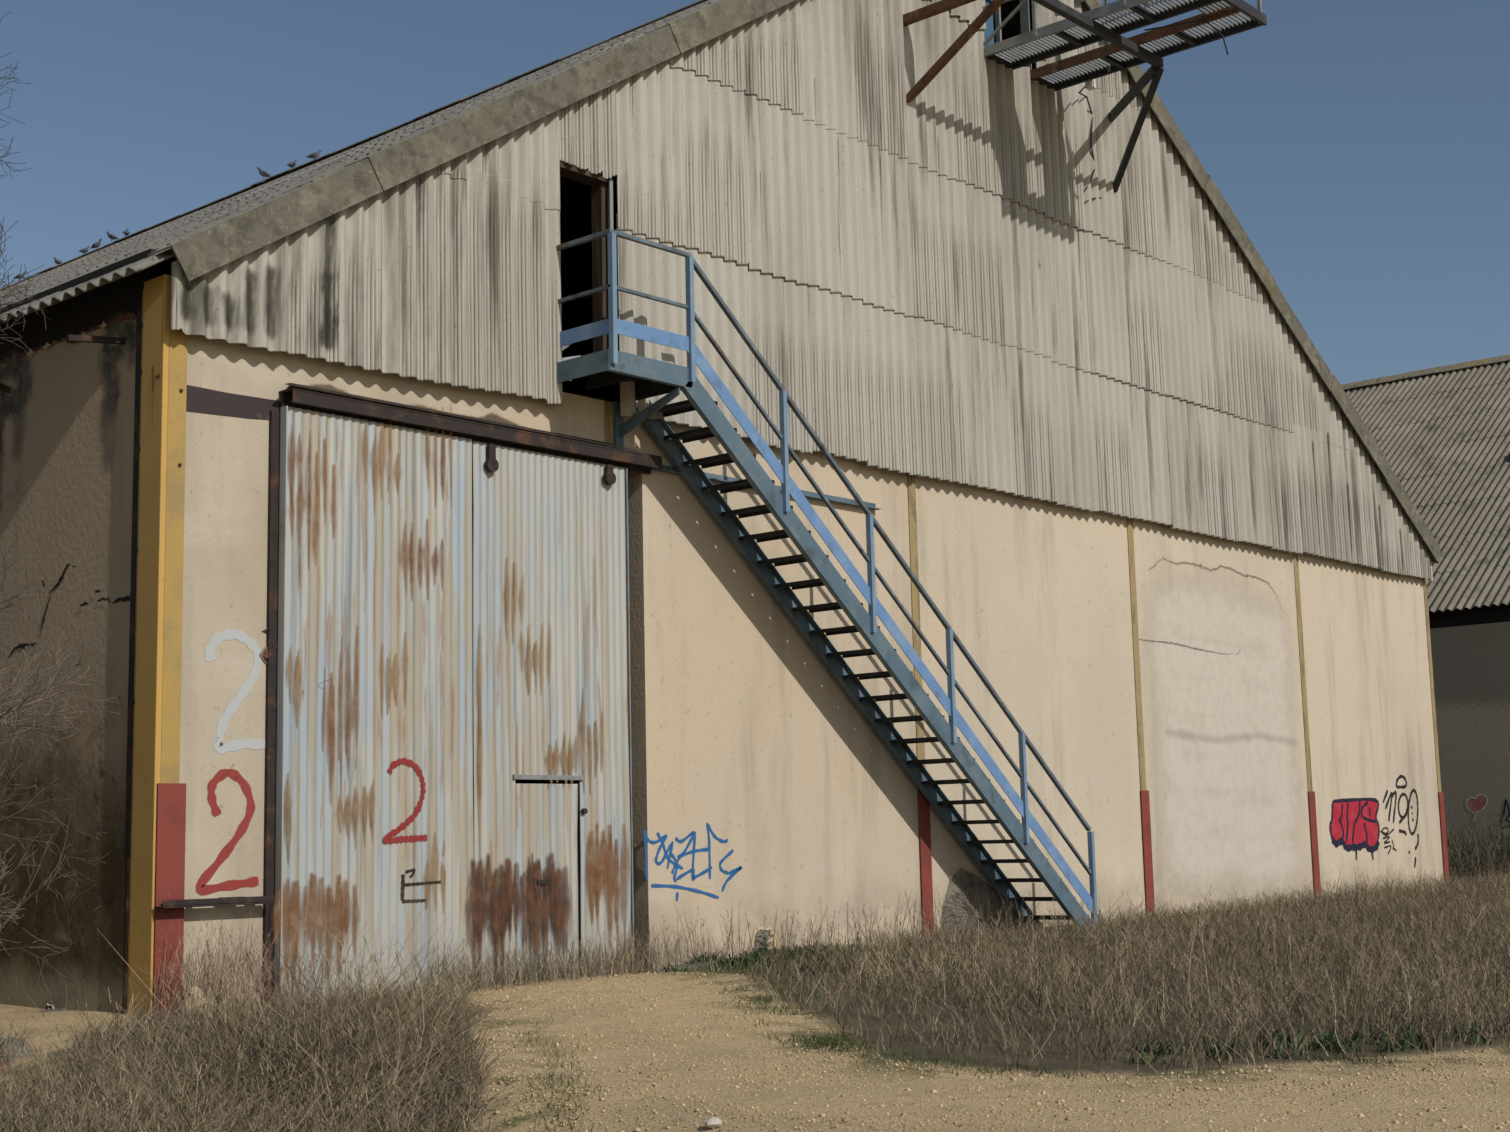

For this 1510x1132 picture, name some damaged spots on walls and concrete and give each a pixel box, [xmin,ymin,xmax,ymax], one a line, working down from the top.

leakage [102,315,136,456]
corrosion [402,407,452,599]
crack [9,563,130,658]
corrosion [506,557,551,692]
corrosion [466,631,572,979]
corrosion [549,688,604,794]
corrosion [274,875,358,979]
corrosion [426,838,445,911]
corrosion [588,824,632,972]